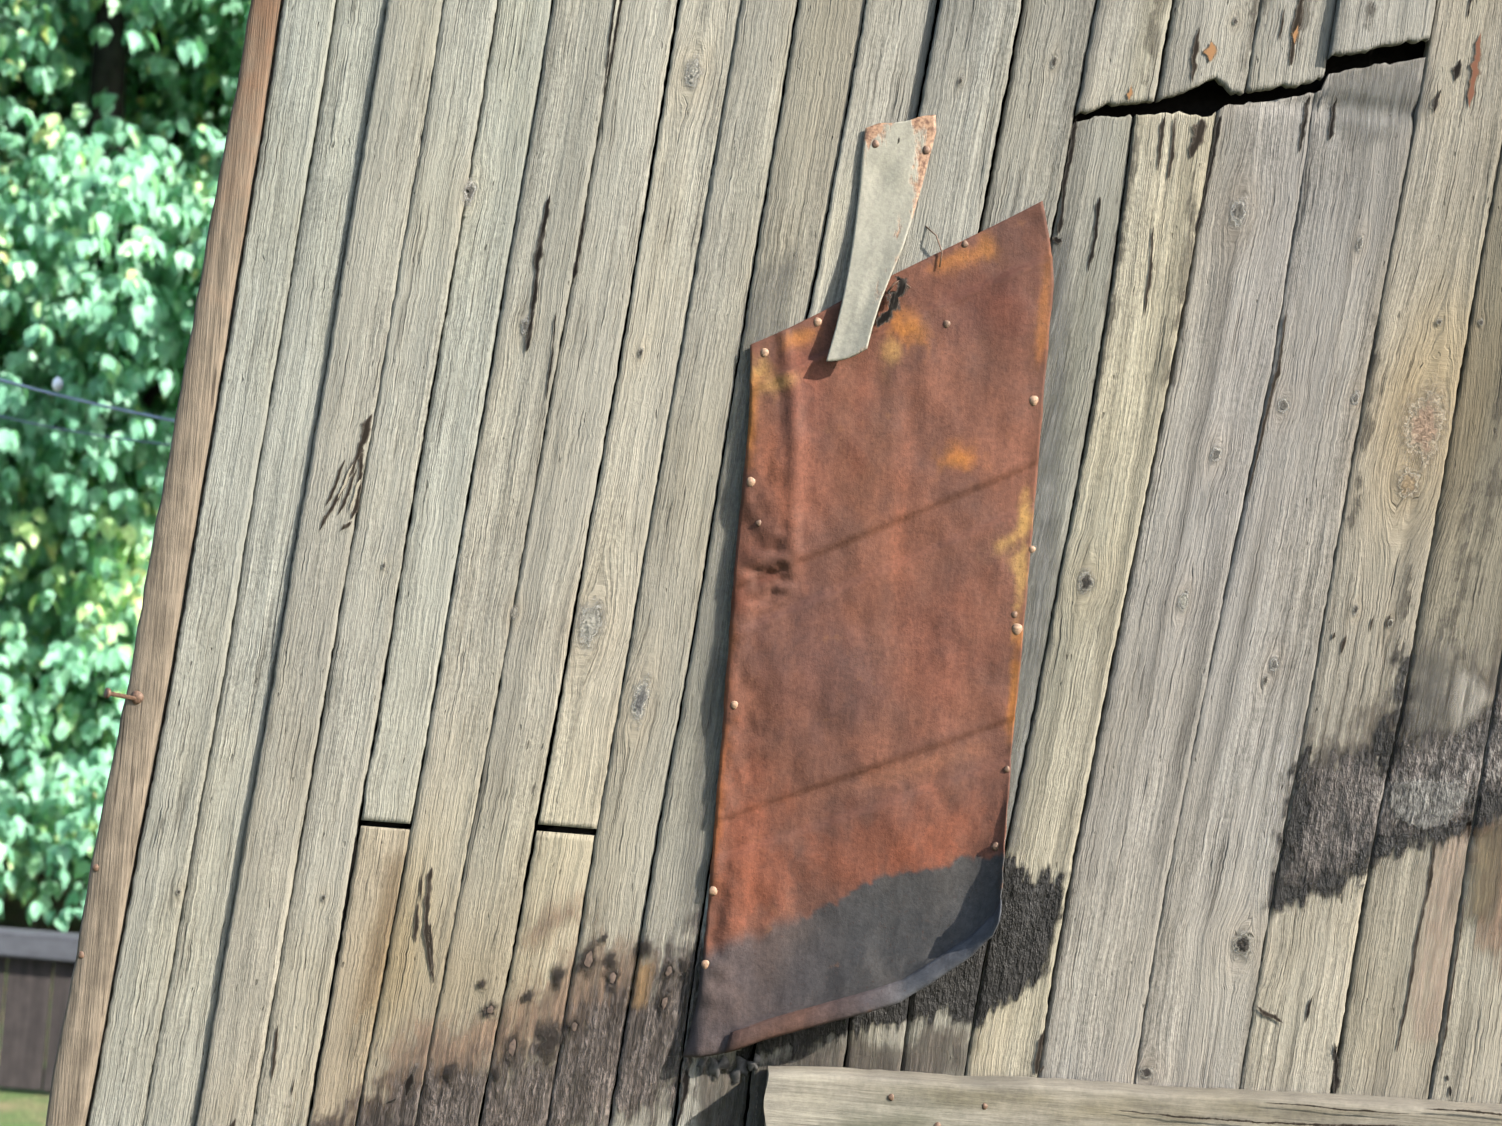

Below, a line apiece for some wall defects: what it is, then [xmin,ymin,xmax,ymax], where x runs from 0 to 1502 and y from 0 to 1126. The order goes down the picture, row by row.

crack [1052,0,1462,272]
crack [1145,226,1154,313]
crack [1248,313,1287,492]
damp [1364,662,1451,774]
damp [1272,745,1319,892]
damp [1466,782,1502,826]